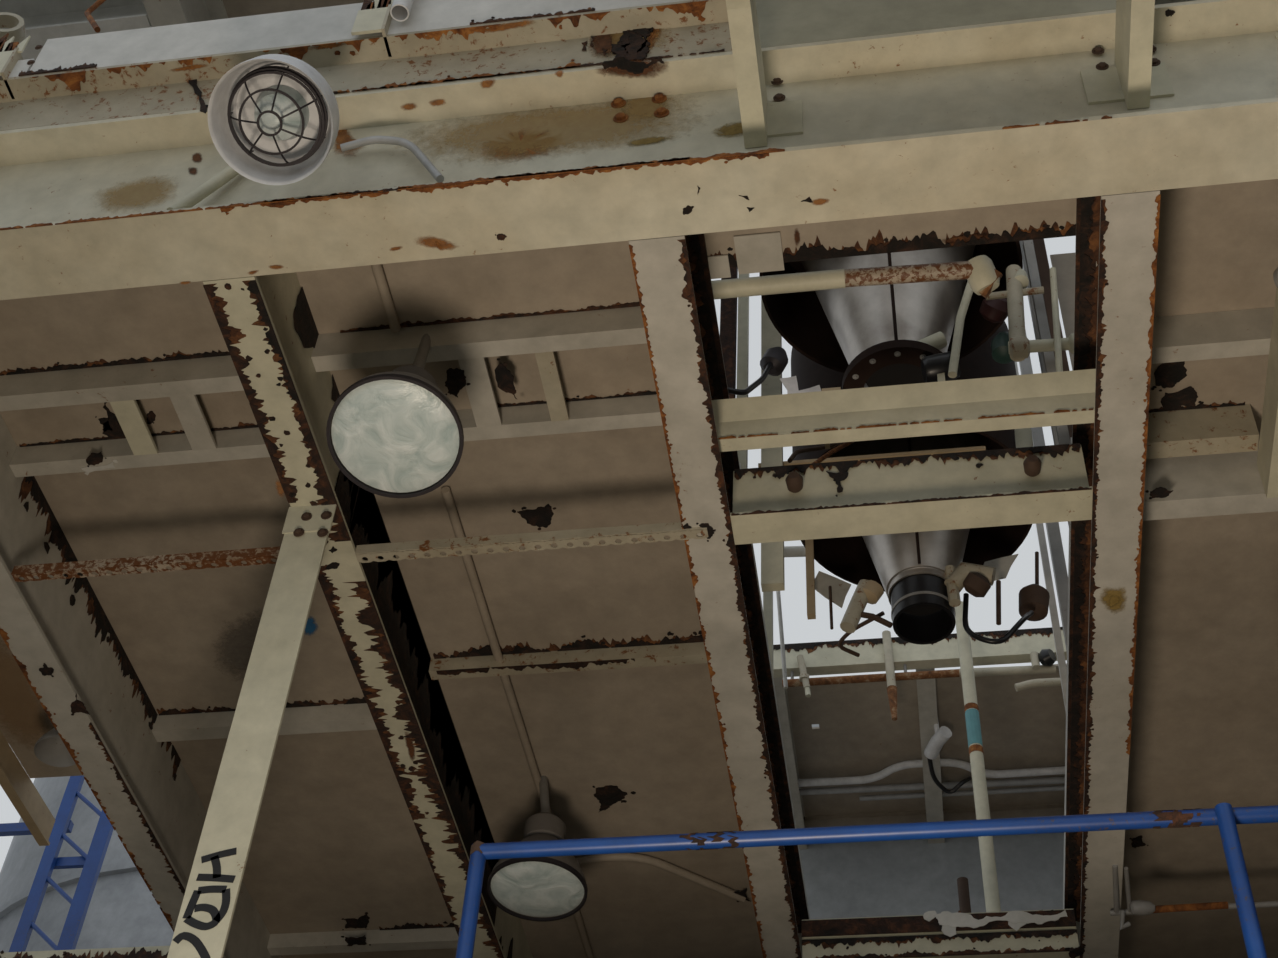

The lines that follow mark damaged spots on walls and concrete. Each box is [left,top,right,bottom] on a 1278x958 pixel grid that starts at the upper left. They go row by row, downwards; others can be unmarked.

rust [637,0,708,22]
rust [263,37,380,60]
rust [333,7,725,94]
rust [18,56,212,114]
rust [335,129,361,153]
rust [434,97,670,159]
rust [716,122,743,137]
rust [0,148,785,230]
rust [0,194,1245,958]
peeling [923,910,1068,937]